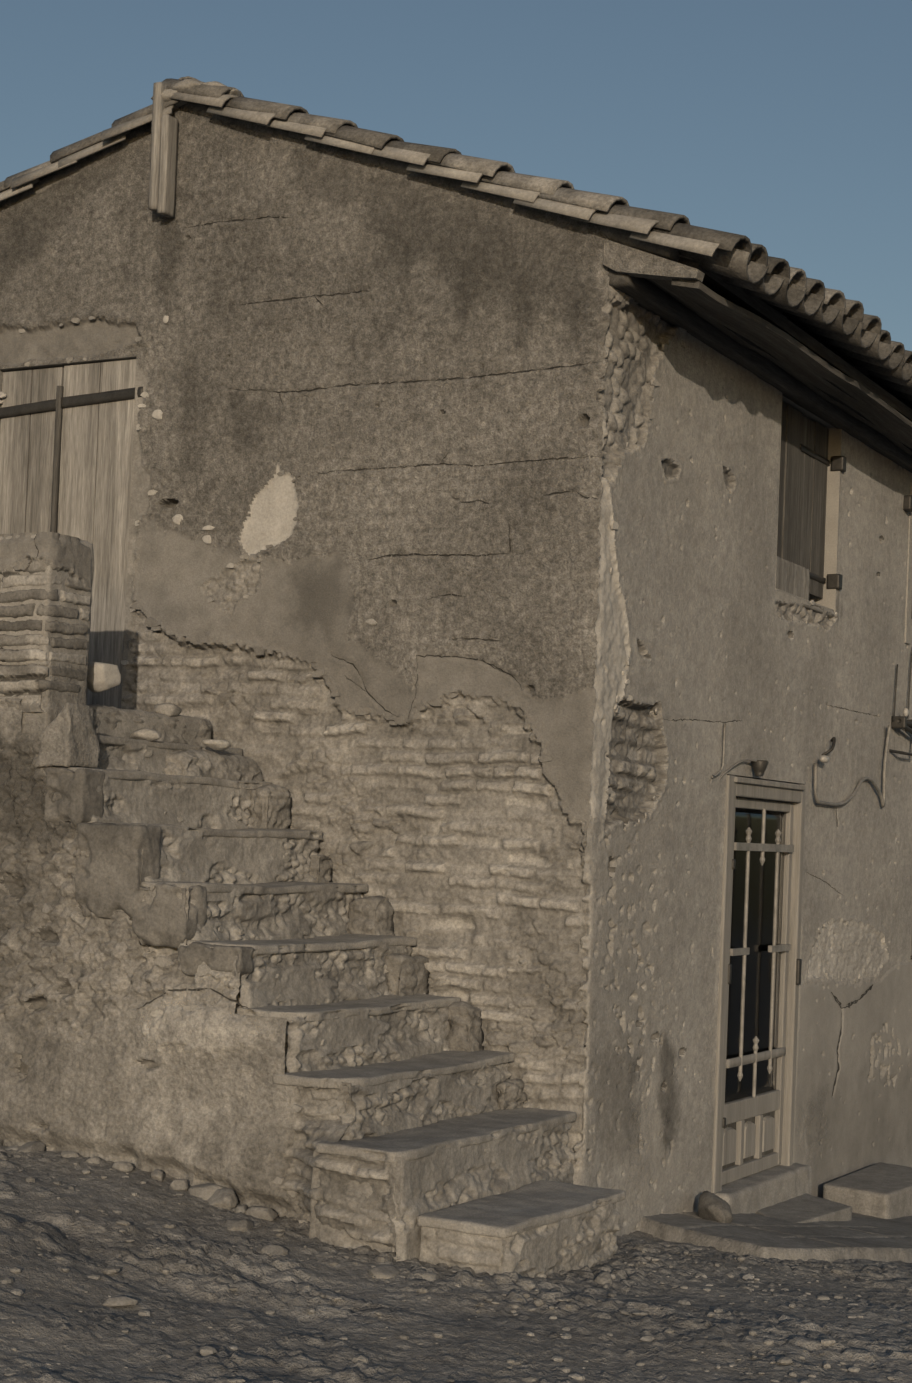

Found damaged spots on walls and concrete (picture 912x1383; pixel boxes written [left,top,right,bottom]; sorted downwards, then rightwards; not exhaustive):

crack [226,361,601,407]
crack [320,452,599,560]
spalling [0,291,687,1248]
peeling [807,918,889,982]
crack [831,984,873,1096]